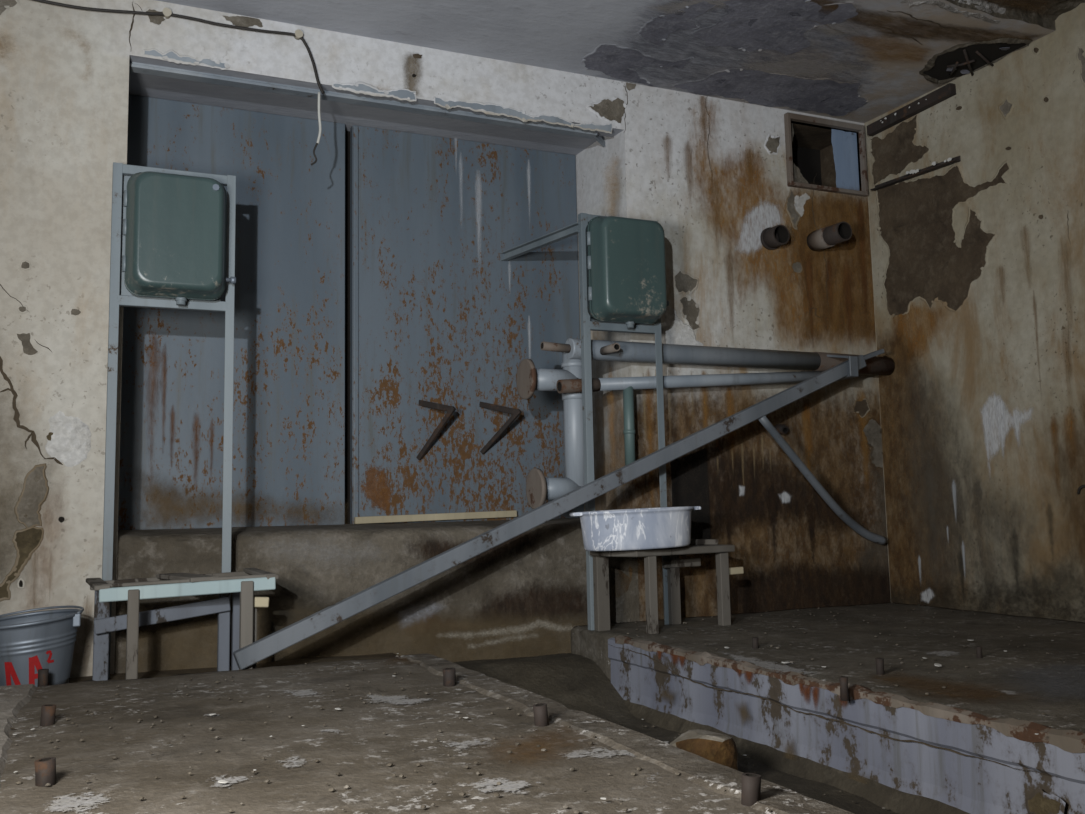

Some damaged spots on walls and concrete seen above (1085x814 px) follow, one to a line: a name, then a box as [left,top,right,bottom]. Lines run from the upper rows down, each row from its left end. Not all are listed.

peeling [434,43,695,134]
peeling [672,68,869,116]
spalling [919,37,1041,84]
peeling [869,98,1014,318]
peeling [667,268,701,332]
crack [0,356,63,465]
corrosion [609,137,956,621]
peeling [0,432,53,602]
corrosion [147,486,264,524]
corrosion [361,463,394,513]
leakage [729,388,1085,622]
corrosion [799,683,818,705]